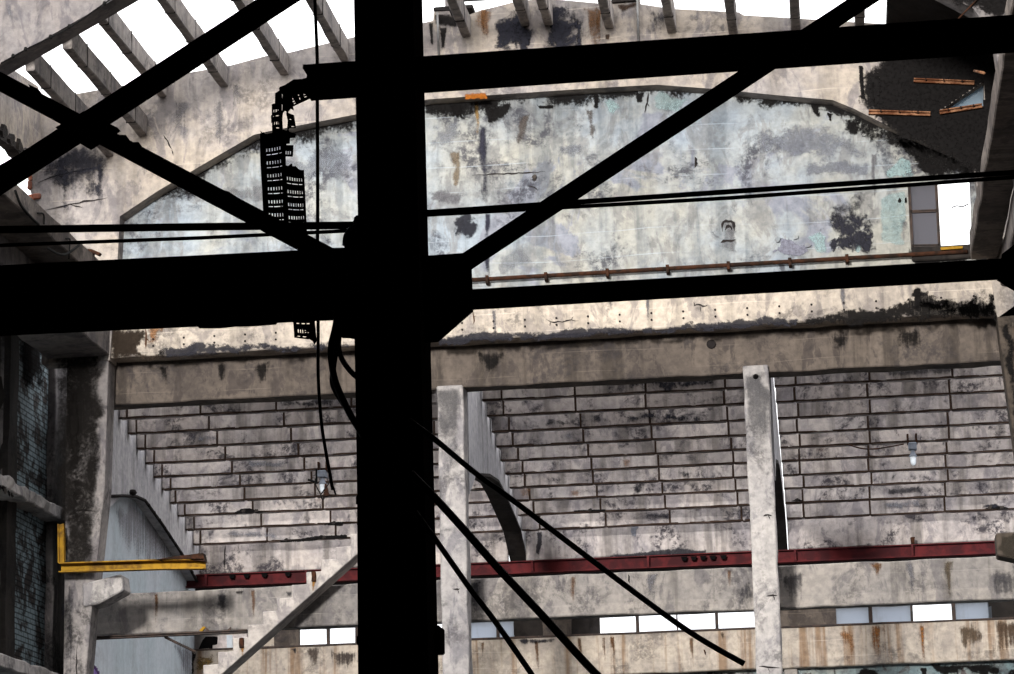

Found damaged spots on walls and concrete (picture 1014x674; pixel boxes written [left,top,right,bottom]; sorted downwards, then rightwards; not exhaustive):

water stain [495,11,533,50]
water stain [544,6,582,47]
water stain [859,66,884,119]
water stain [759,103,876,191]
water stain [45,147,106,208]
water stain [829,195,876,252]
water stain [439,288,996,370]